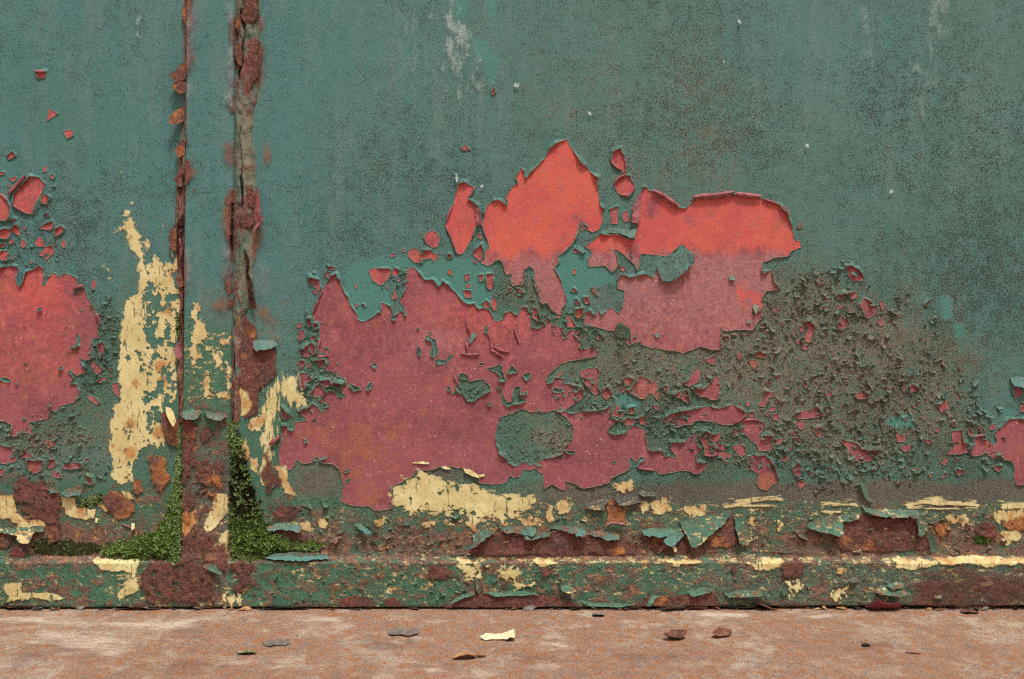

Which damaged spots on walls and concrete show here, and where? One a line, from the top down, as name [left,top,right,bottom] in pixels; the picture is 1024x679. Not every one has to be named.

corrosion [169,0,195,192]
corrosion [228,0,264,113]
corrosion [218,185,264,308]
corrosion [240,296,278,418]
peeling [0,139,1024,610]
corrosion [0,476,62,557]
corrosion [103,408,261,609]
corrosion [261,449,307,542]
corrosion [462,490,754,577]
corrosion [807,479,950,553]
corrosion [975,516,1024,538]
corrosion [445,586,720,608]